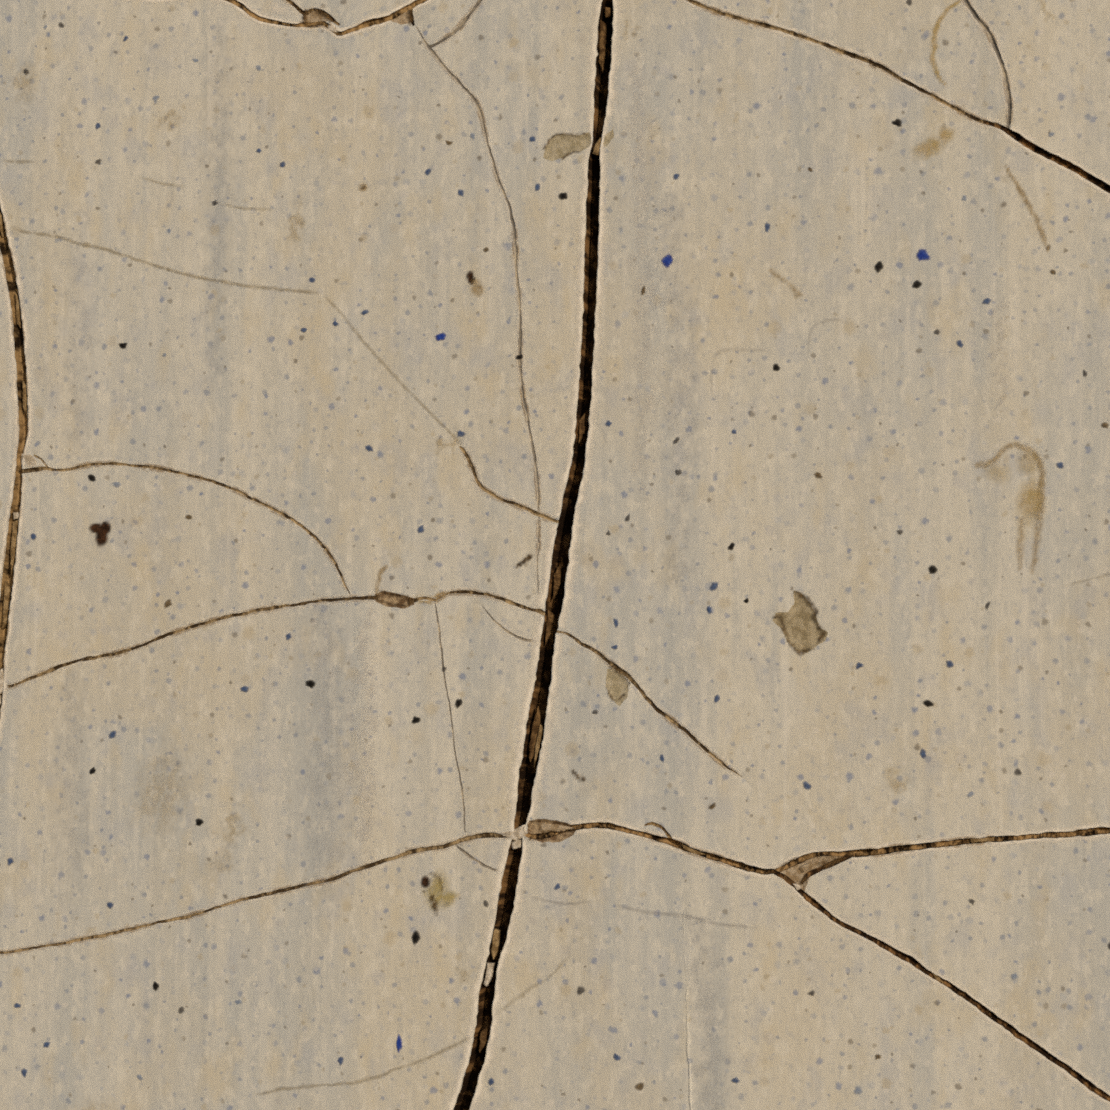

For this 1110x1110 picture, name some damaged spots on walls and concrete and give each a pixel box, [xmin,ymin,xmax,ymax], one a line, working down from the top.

crack [213,0,432,38]
spalling [543,129,614,161]
crack [0,191,378,741]
crack [411,0,1110,1110]
spalling [772,591,828,653]
crack [0,830,507,954]